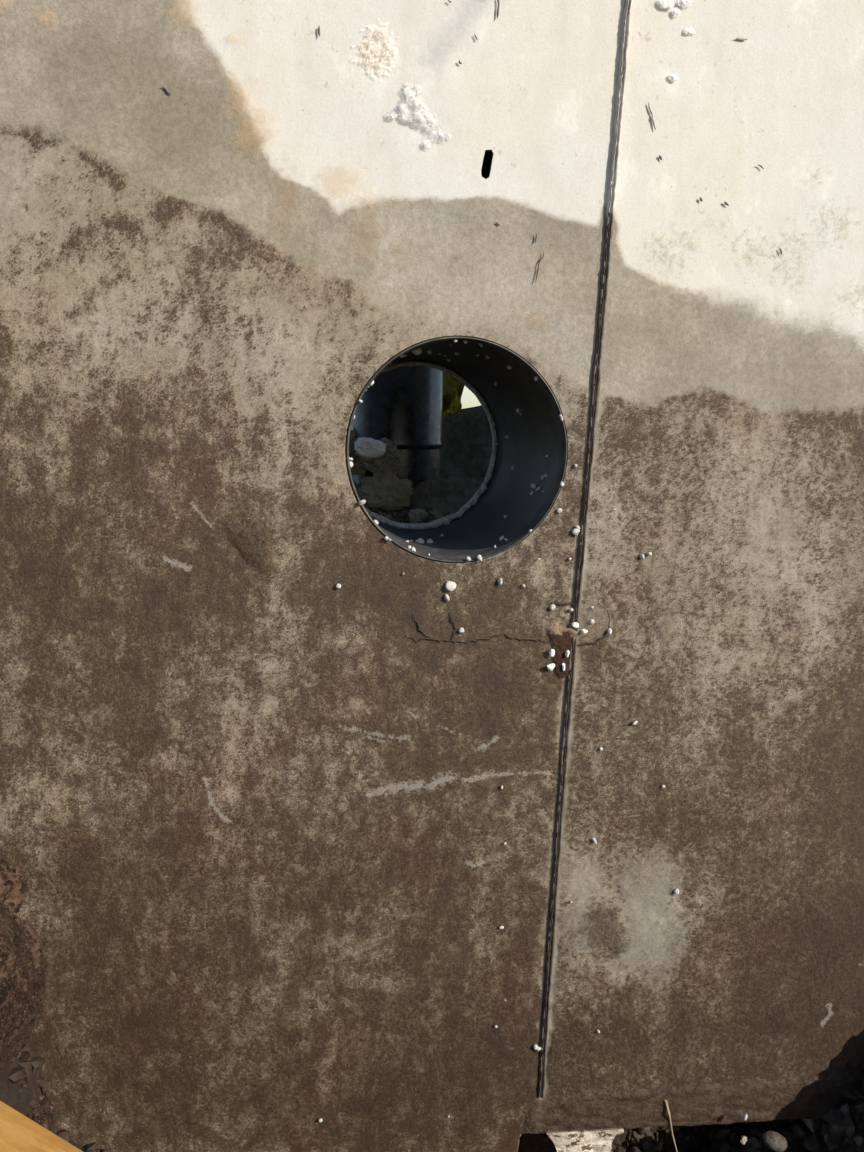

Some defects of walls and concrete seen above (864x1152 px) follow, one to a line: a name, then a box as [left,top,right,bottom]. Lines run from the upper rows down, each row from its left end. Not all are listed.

water stain [0,777,68,836]
water stain [207,584,362,797]
water stain [0,0,606,631]
crack [407,0,629,1096]
crack [648,102,662,160]
water stain [507,217,864,1109]